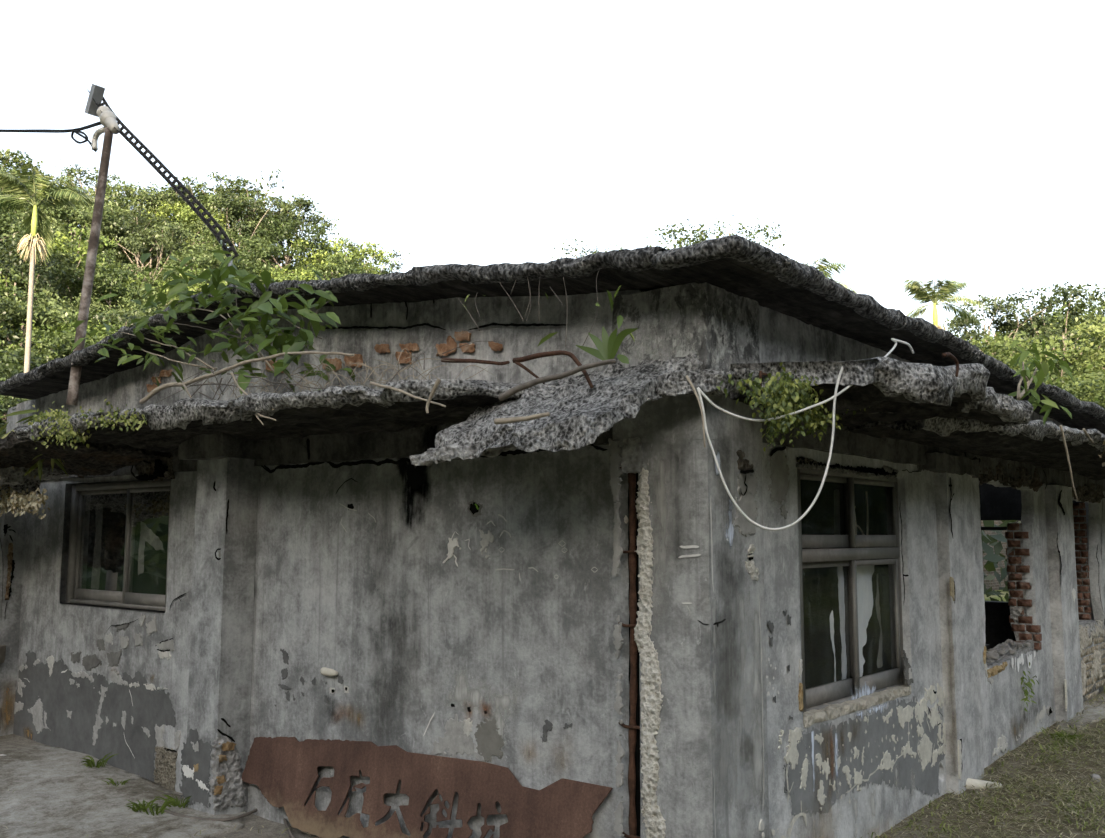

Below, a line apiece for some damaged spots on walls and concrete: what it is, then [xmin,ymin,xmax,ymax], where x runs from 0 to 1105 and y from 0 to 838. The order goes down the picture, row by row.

damp [423,425,439,452]
damp [397,456,429,528]
crack [949,452,981,537]
crack [1057,490,1065,575]
spalling [608,436,666,838]
flaking render [983,646,1008,684]
peeling [13,614,247,812]
peeling [541,719,573,743]
peeling [772,659,963,838]